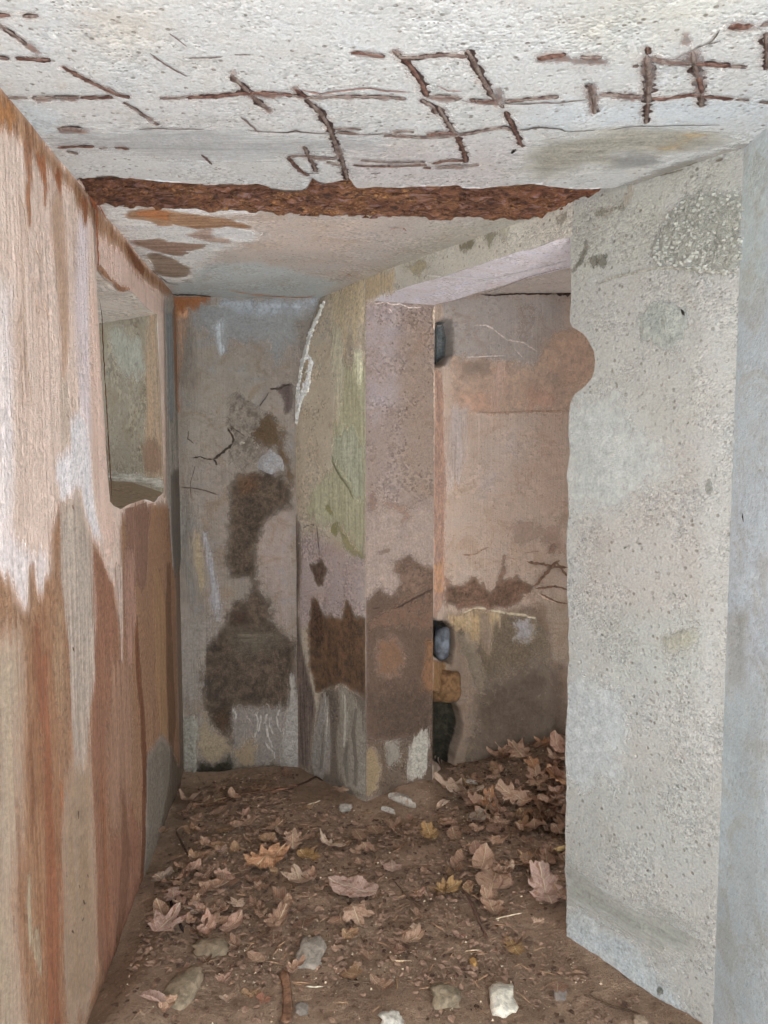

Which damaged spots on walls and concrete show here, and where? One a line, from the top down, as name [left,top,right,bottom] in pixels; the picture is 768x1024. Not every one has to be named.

spalling [0,12,159,126]
spalling [57,126,129,155]
spalling [160,49,560,180]
spalling [537,51,608,65]
spalling [584,33,768,124]
spalling [728,20,768,70]
rust [0,88,210,391]
crack [260,384,291,406]
crack [182,428,234,495]
damp [108,295,535,877]
crack [462,547,589,604]
rust [0,498,180,1024]